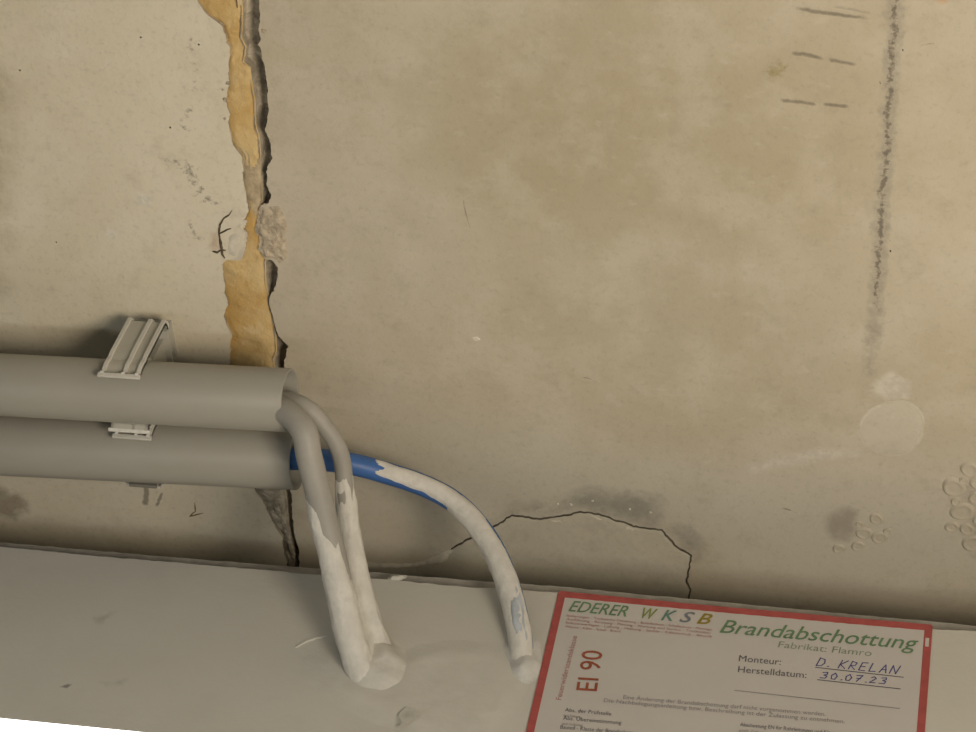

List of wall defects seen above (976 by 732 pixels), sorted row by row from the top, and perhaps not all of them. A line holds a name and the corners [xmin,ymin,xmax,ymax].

damp [0,46,31,306]
crack [197,0,288,368]
crack [255,488,300,567]